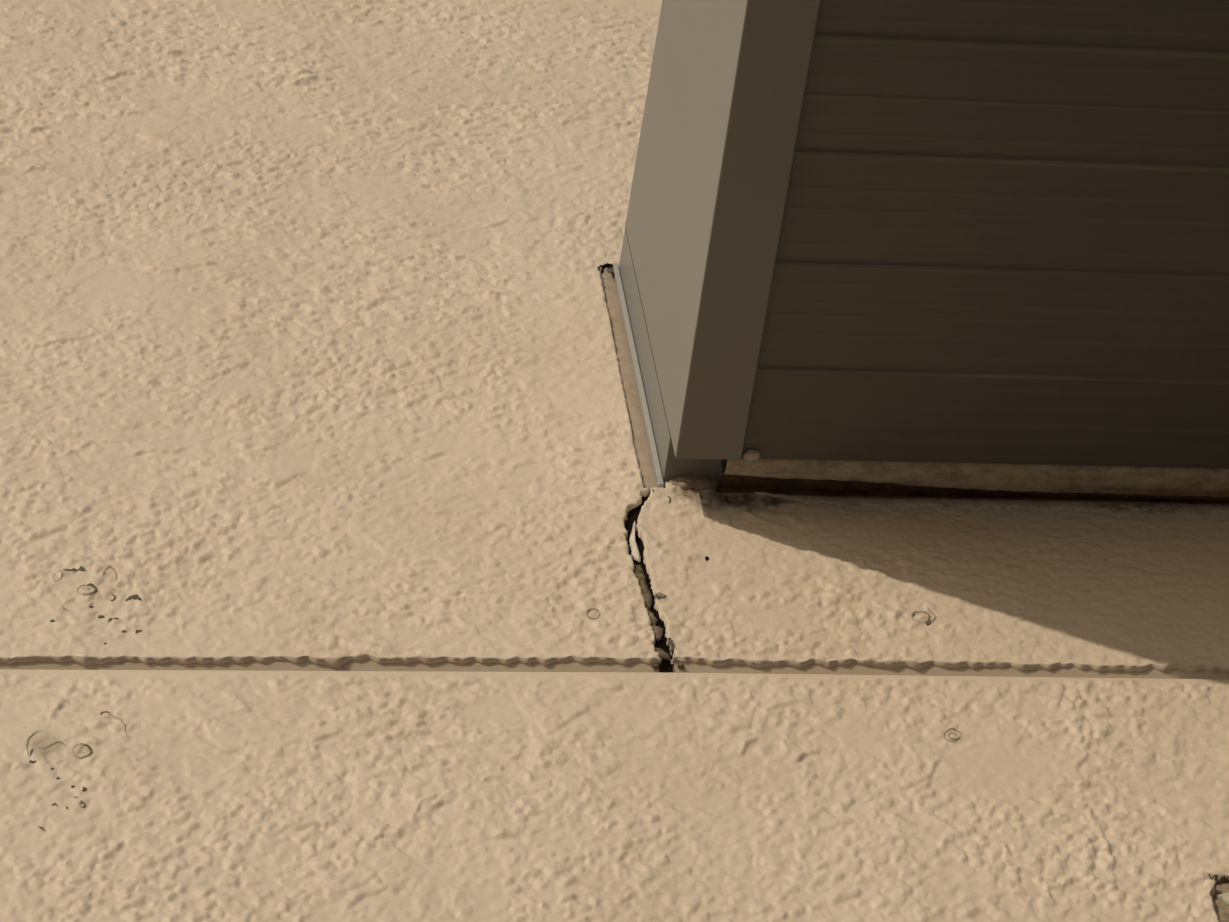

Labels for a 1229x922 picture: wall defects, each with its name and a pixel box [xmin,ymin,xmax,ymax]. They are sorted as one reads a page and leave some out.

crack [623,489,685,673]